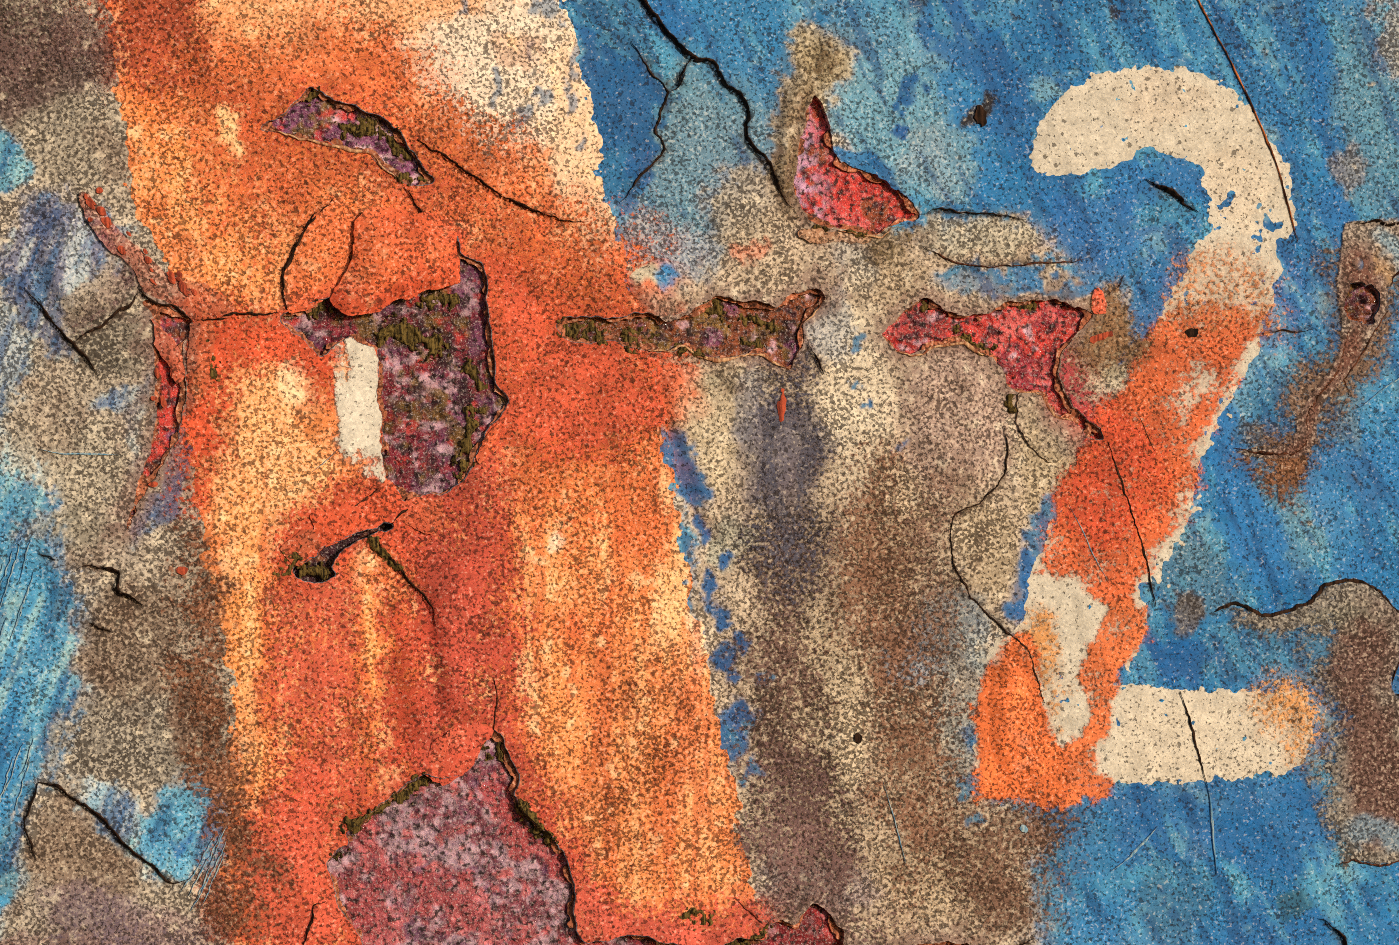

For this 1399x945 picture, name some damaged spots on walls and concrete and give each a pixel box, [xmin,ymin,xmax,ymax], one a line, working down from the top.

peeling [261,86,433,187]
crack [622,0,794,208]
peeling [793,97,919,244]
peeling [273,197,508,583]
peeling [556,289,824,370]
peeling [882,288,1113,462]
peeling [1238,220,1399,459]
crack [950,426,1045,703]
crack [1108,442,1156,607]
peeling [1214,578,1399,873]
peeling [327,723,676,945]
peeling [725,903,842,945]